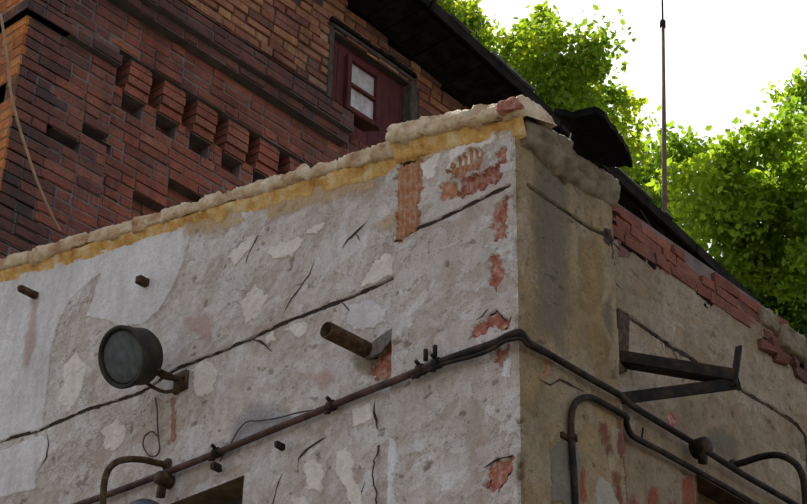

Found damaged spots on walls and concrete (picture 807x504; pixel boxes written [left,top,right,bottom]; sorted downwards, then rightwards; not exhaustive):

flaking render [394,131,509,244]
crack [393,186,623,265]
flaking render [360,252,394,288]
flaking render [0,222,190,498]
crack [0,262,393,473]
flaking render [191,358,219,397]
flaking render [468,309,510,340]
crack [541,378,583,391]
crack [616,308,699,363]
spalling [758,337,807,384]
crack [739,389,807,464]
flaking render [485,455,515,493]